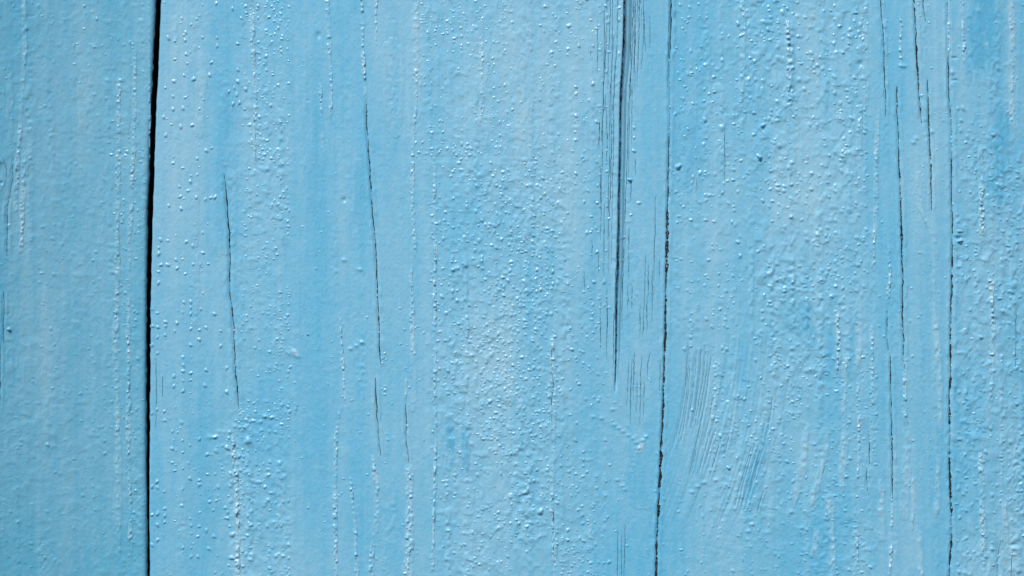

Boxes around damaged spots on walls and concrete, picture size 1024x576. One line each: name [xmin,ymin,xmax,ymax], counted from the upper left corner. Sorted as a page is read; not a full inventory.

crack [224,175,240,412]
crack [366,102,382,455]
crack [584,0,672,576]
crack [866,0,954,576]